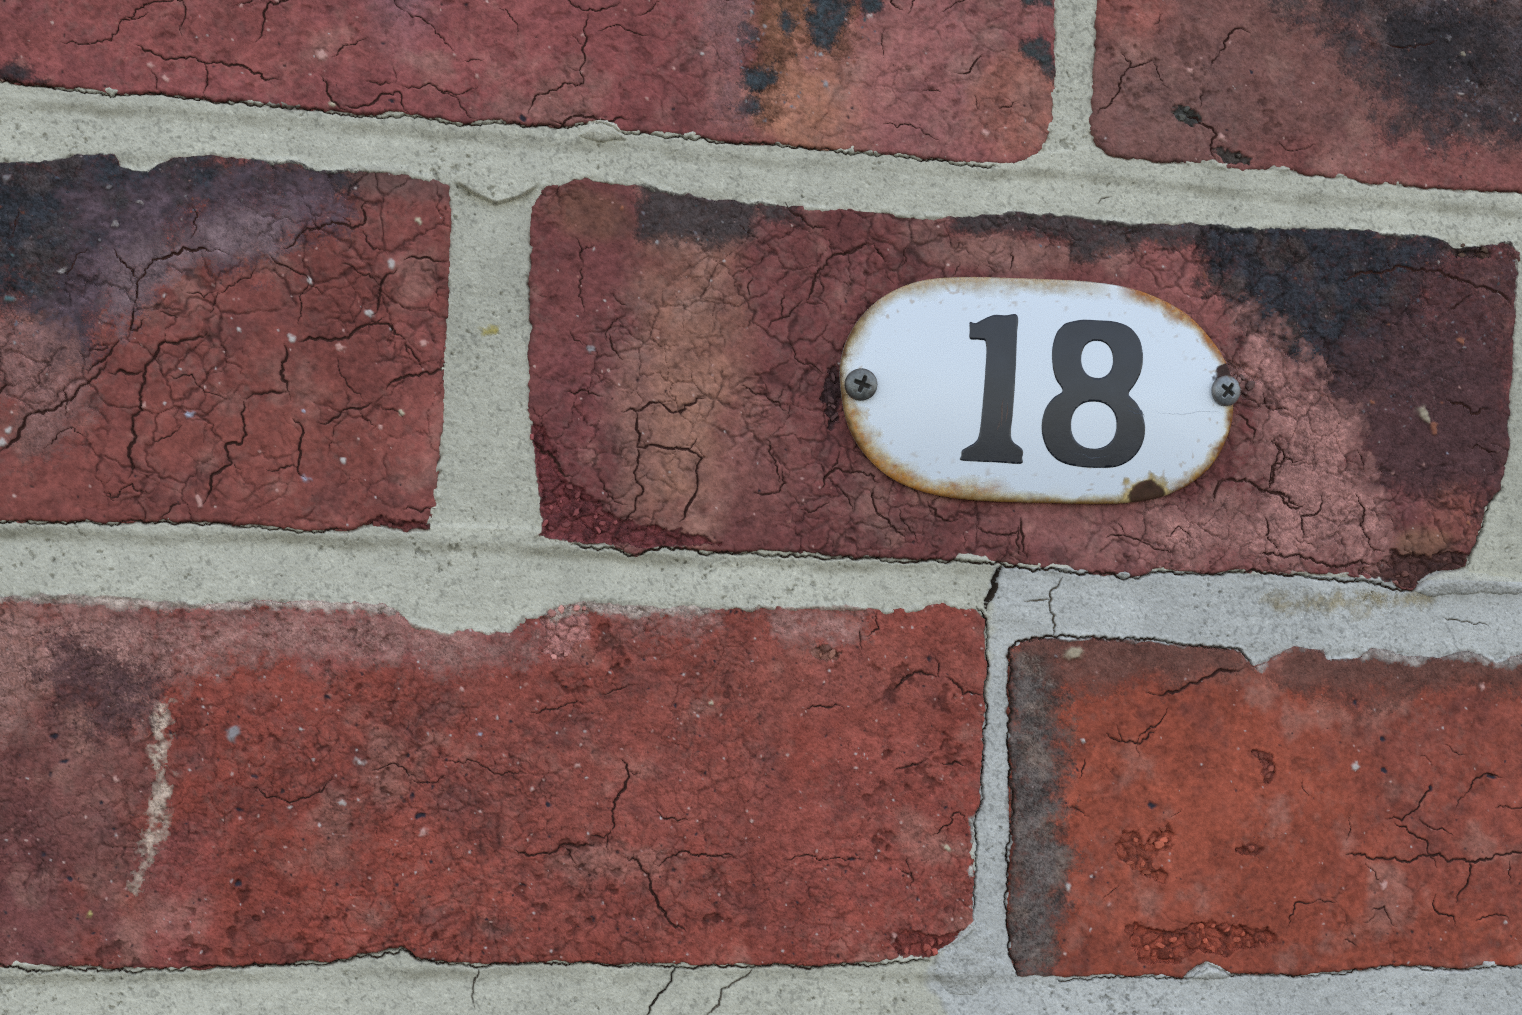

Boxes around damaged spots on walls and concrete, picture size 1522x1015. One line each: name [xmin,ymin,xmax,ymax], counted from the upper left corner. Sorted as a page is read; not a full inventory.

crack [2,0,1014,169]
crack [0,201,446,534]
crack [538,240,626,360]
crack [747,202,907,373]
crack [1344,255,1512,311]
crack [1448,400,1502,561]
crack [531,381,1410,970]
crack [0,759,928,1015]
crack [1060,974,1186,982]
spalling [1115,824,1174,884]
spalling [1125,921,1276,964]
crack [1231,744,1522,978]